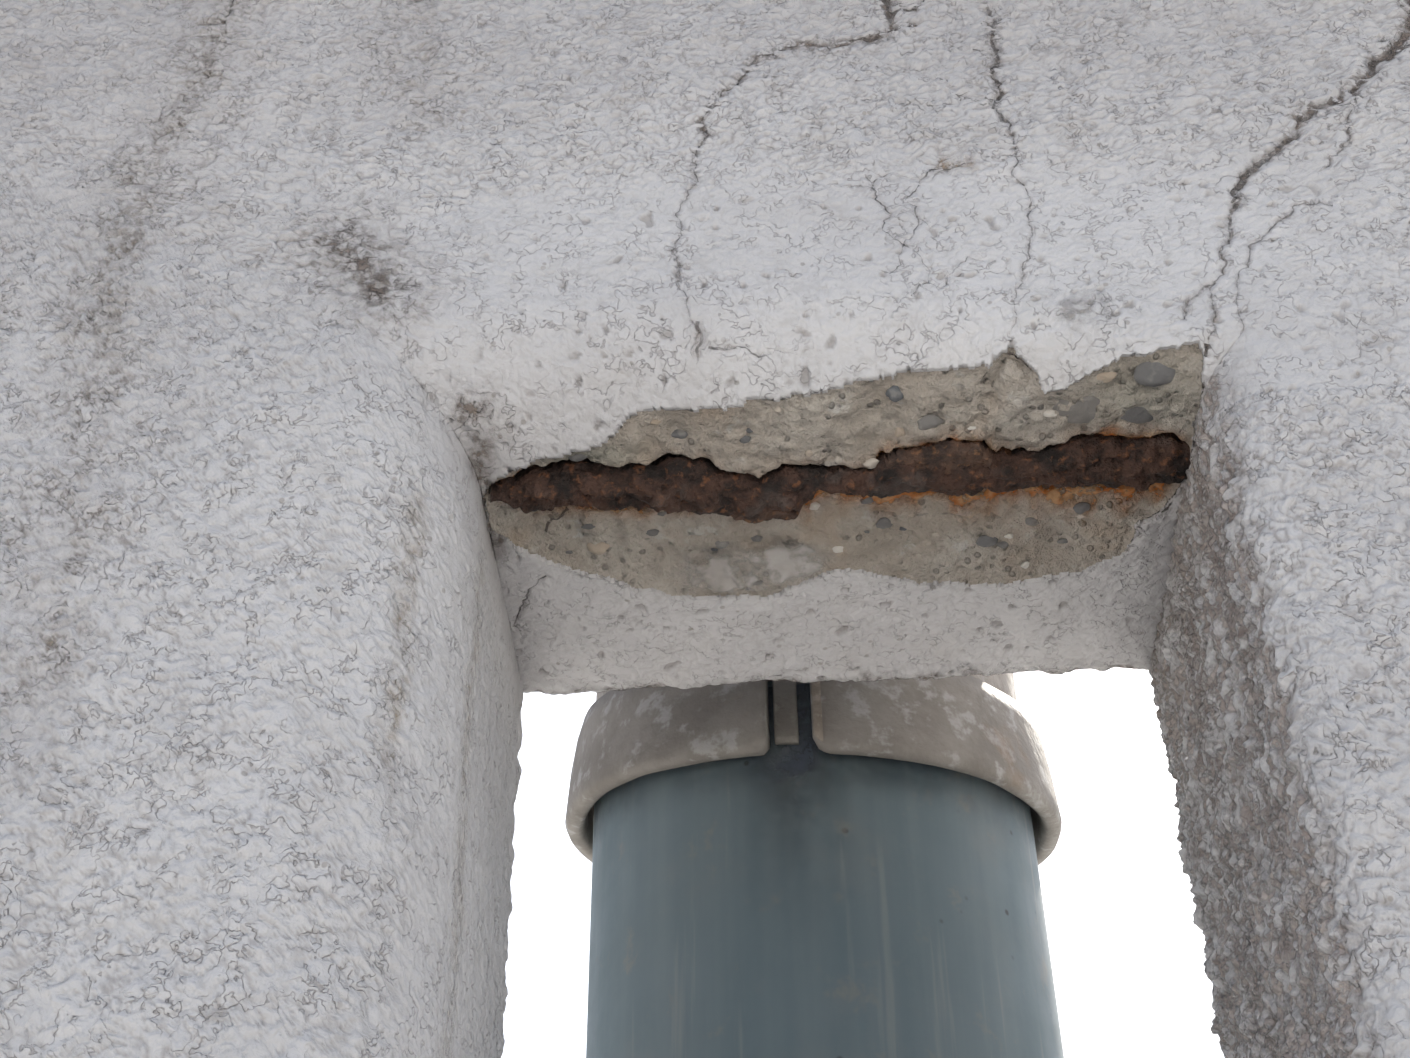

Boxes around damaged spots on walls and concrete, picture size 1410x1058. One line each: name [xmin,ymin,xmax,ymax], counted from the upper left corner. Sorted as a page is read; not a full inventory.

crack [696,0,917,151]
crack [941,11,1012,136]
crack [1228,0,1410,244]
spalling [482,343,1204,598]
corrosion [718,483,1167,524]